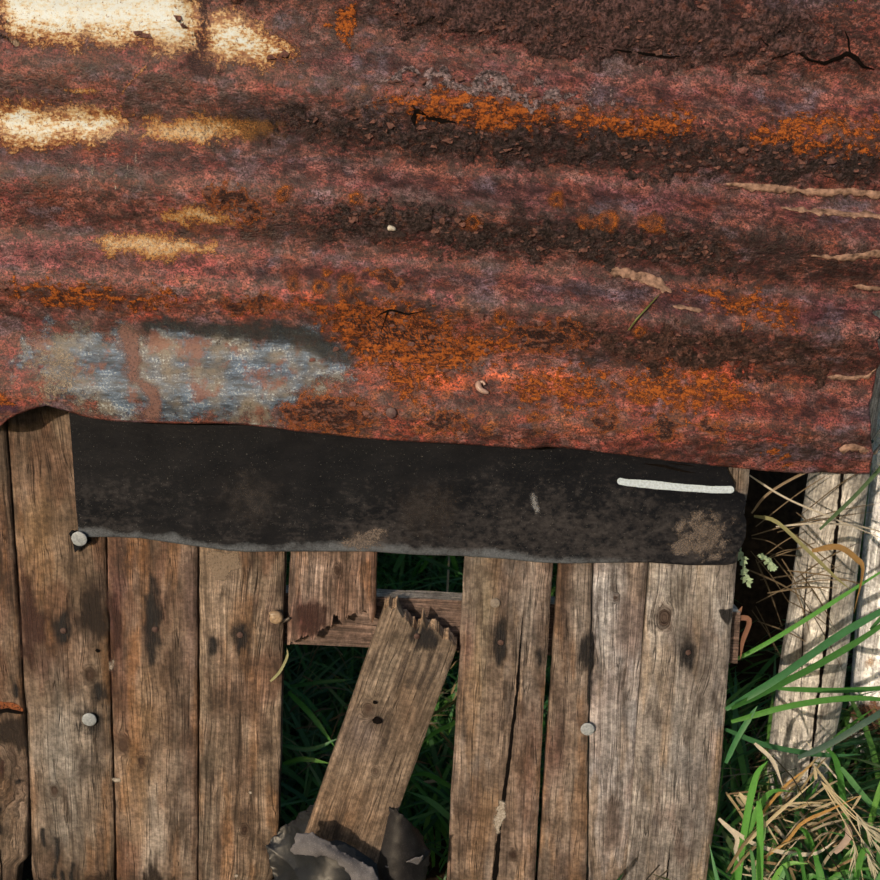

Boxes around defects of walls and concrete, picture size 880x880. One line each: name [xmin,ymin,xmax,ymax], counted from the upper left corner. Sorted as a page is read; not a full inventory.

rust [261,0,880,220]
crack [760,31,874,70]
rust [3,269,188,318]
rust [839,444,869,454]
crack [800,474,844,795]
crack [492,617,523,880]